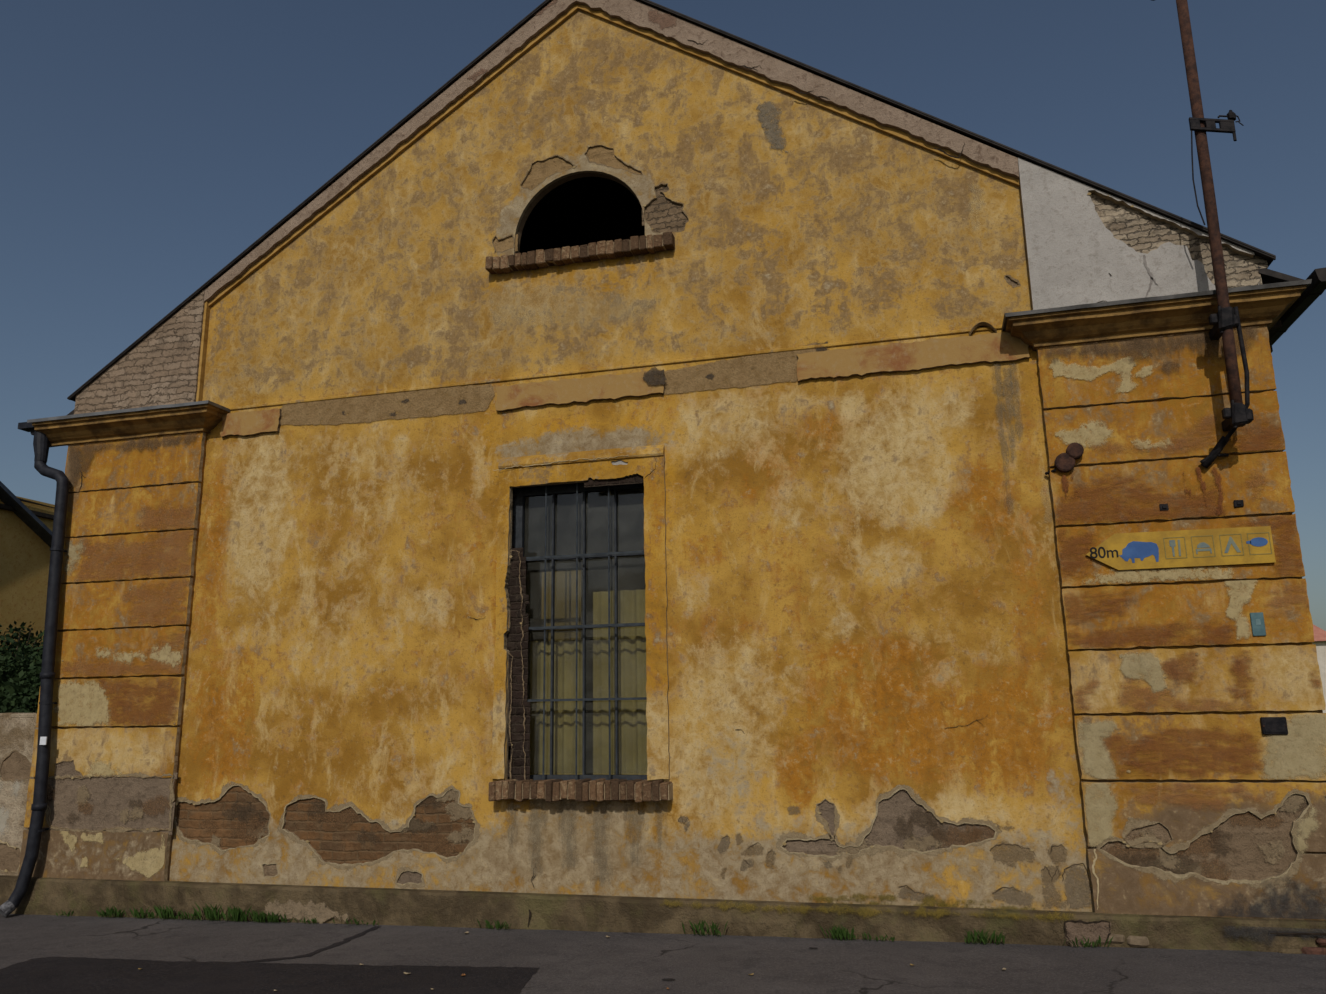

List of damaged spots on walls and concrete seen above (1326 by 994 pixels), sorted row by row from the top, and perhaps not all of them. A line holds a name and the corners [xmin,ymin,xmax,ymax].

spalling [492,234,518,253]
spalling [520,145,643,191]
spalling [642,183,689,233]
spalling [1087,192,1268,288]
peeling [1049,354,1153,393]
peeling [1059,532,1257,639]
flaking render [507,548,530,781]
peeling [1119,652,1251,711]
flaking render [0,750,31,792]
spalling [45,760,480,889]
spalling [717,784,1092,909]
spalling [1076,681,1326,890]